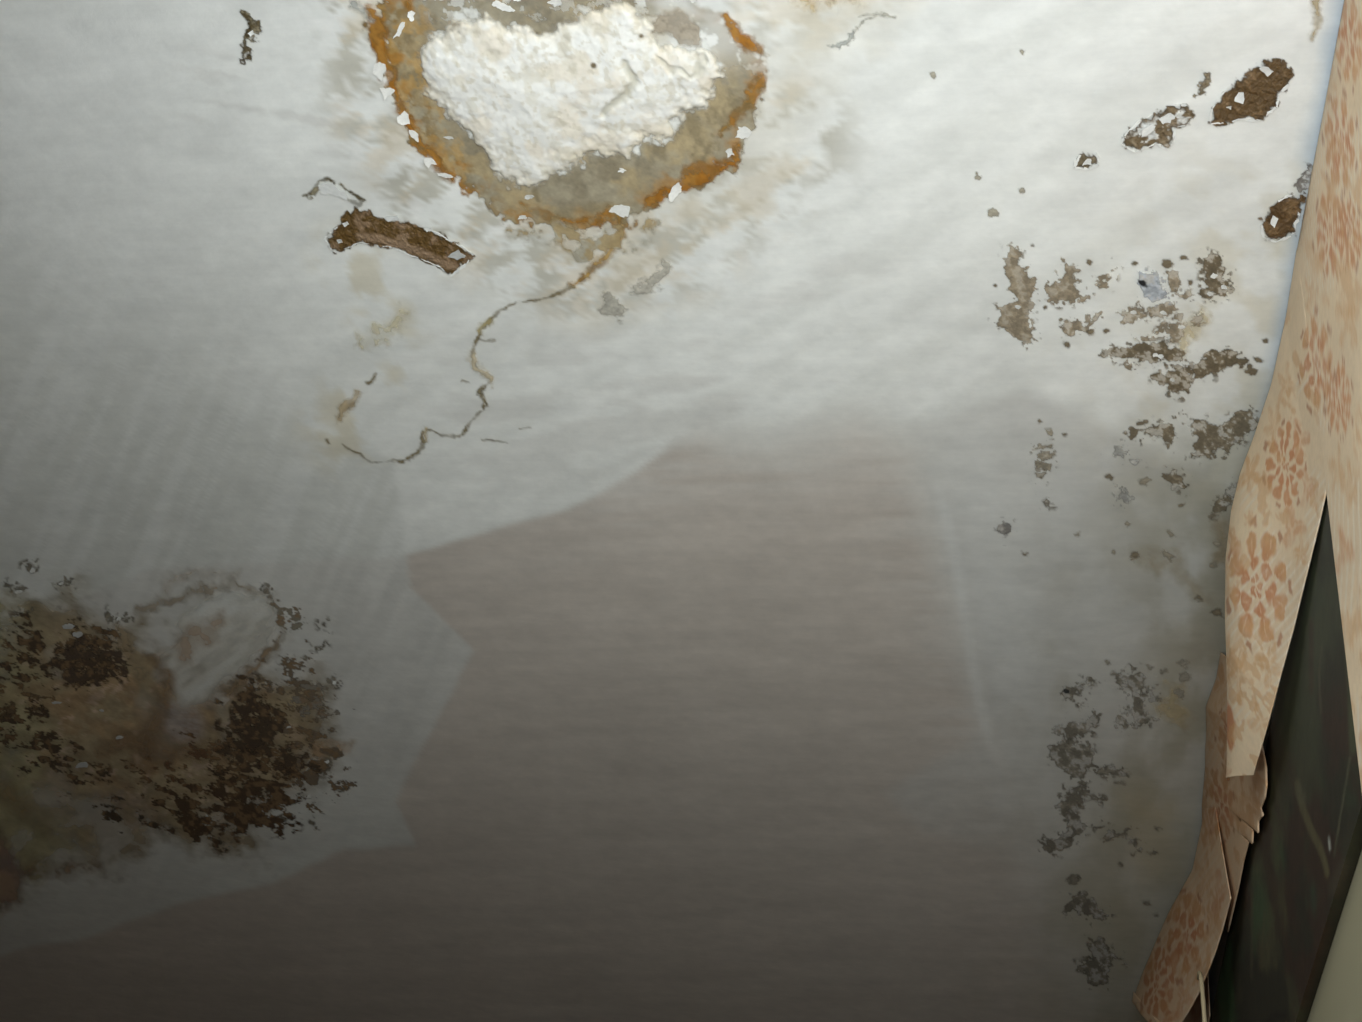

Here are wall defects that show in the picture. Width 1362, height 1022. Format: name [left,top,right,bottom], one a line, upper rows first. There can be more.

spalling [240,10,262,65]
spalling [1121,58,1294,153]
spalling [304,177,475,277]
spalling [1073,152,1100,170]
spalling [1258,164,1313,243]
peeling [993,245,1262,401]
crack [326,311,402,456]
crack [397,287,575,463]
peeling [1031,420,1067,479]
peeling [1105,406,1258,507]
leakage [0,560,357,905]
peeling [1039,660,1190,866]